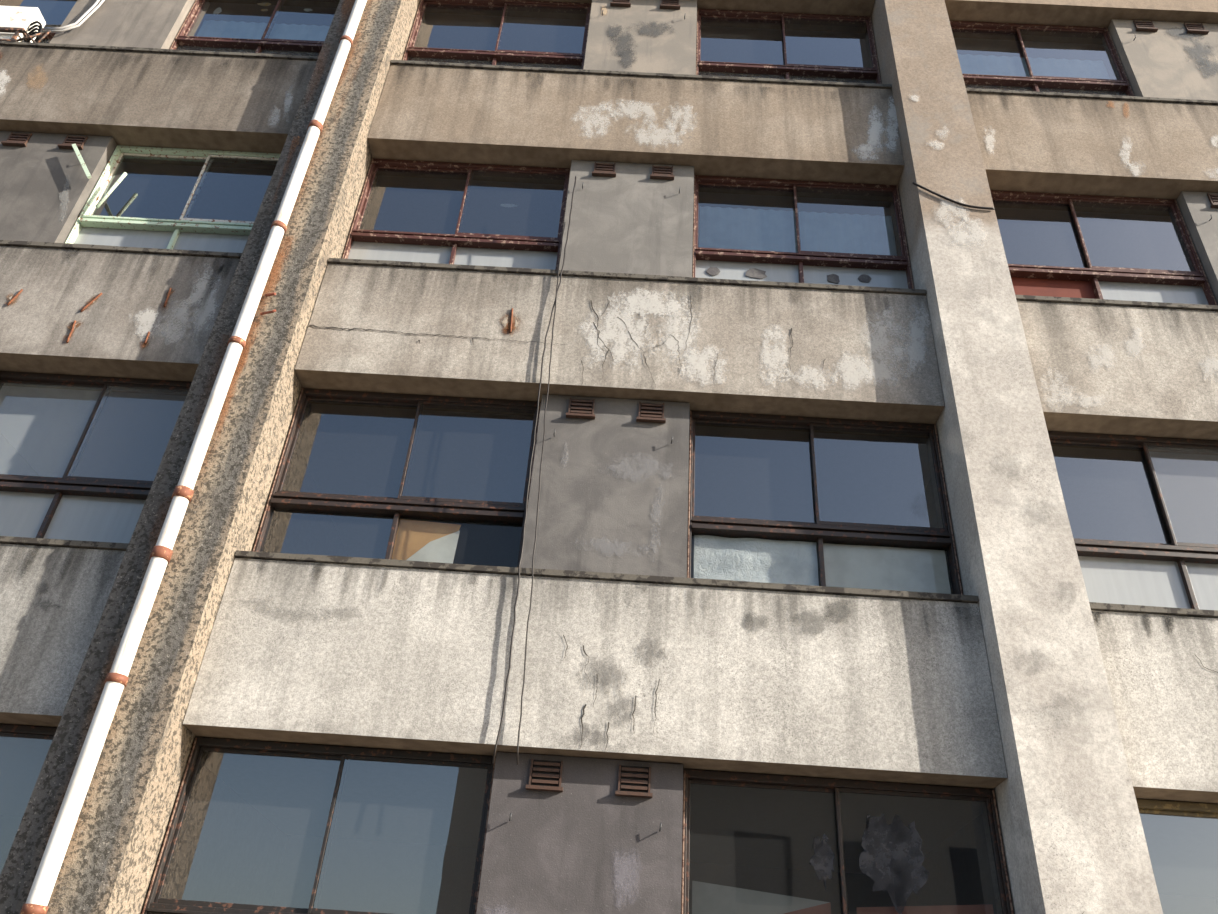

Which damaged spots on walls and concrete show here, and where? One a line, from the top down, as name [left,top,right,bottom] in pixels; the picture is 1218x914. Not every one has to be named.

damp [608,22,673,68]
damp [855,99,899,160]
damp [1121,143,1139,176]
damp [938,199,985,243]
crack [309,295,692,388]
damp [761,307,930,390]